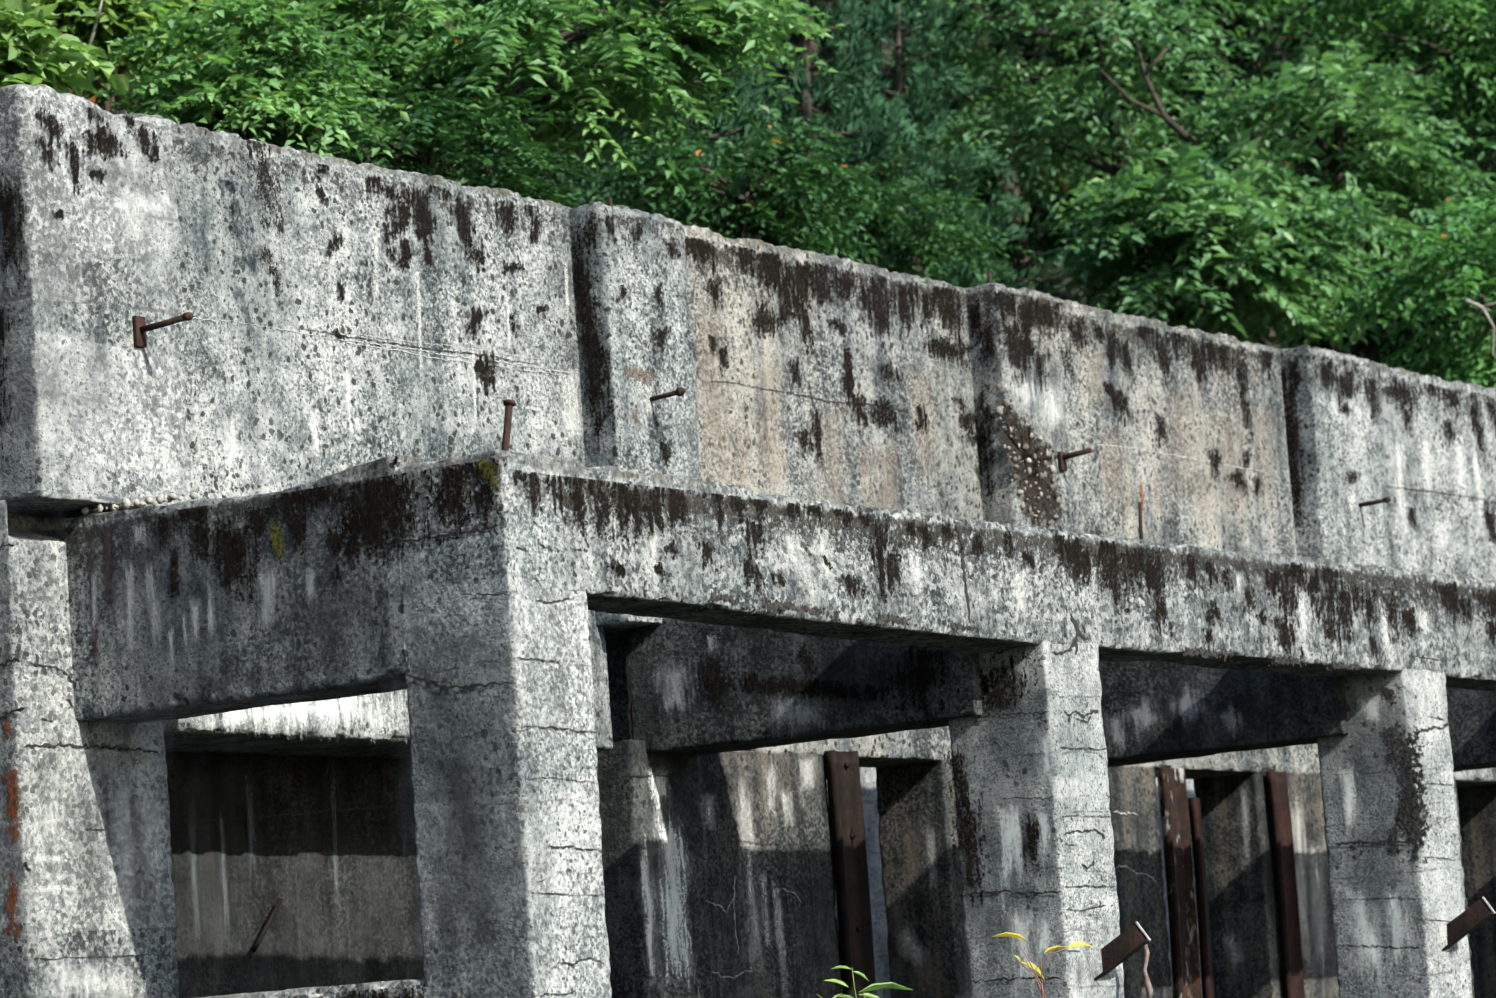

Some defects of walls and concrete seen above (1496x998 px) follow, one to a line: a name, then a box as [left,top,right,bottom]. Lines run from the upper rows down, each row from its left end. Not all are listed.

damp [0,169,30,343]
damp [366,174,457,270]
damp [470,200,541,275]
spalling [992,383,1067,530]
damp [1406,505,1418,531]
damp [1482,500,1496,548]
damp [1181,553,1423,663]
damp [1433,580,1496,649]
corrosion [0,719,24,844]
damp [651,773,666,799]
corrosion [4,876,21,940]
damp [641,820,691,976]